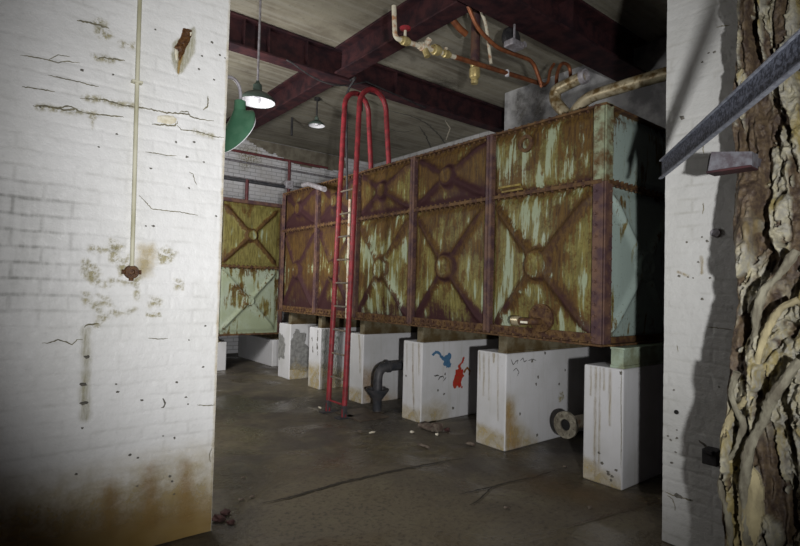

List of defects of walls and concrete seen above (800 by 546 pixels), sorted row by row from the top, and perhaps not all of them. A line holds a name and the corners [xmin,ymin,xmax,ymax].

spalling [174,28,193,73]
crack [22,20,224,138]
crack [139,195,195,215]
crack [46,323,99,345]
spalling [278,329,339,374]
crack [263,458,464,503]